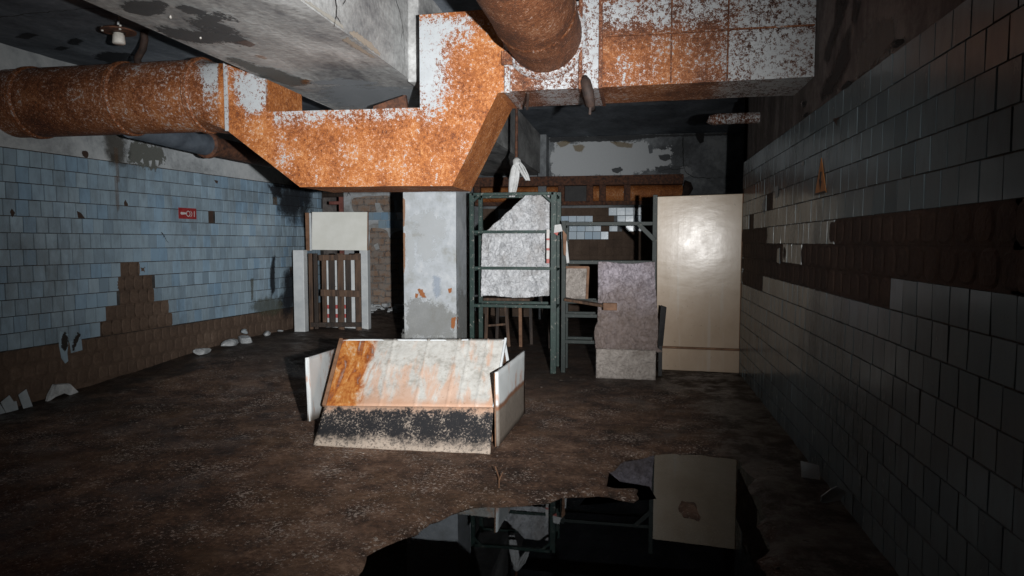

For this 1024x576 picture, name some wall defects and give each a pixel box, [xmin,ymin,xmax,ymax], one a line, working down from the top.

rust [215,138,276,169]
flaking render [550,136,674,176]
peeling [741,198,1024,309]
peeling [0,262,294,414]